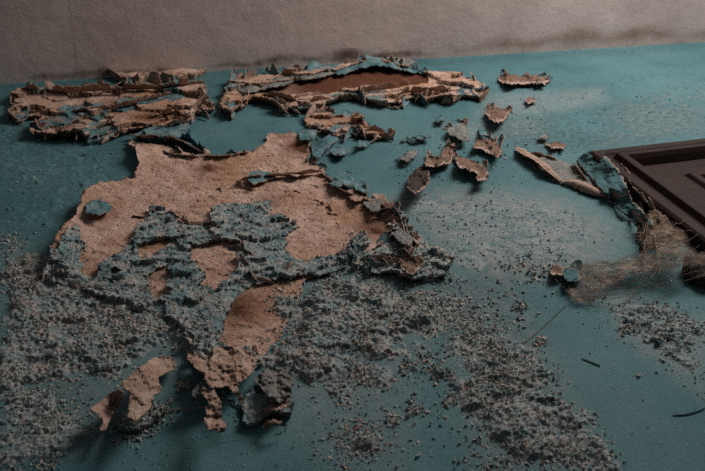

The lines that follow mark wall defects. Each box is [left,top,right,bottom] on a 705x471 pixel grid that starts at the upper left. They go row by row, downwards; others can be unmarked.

peeling [0,53,627,471]
peeling [515,131,661,235]